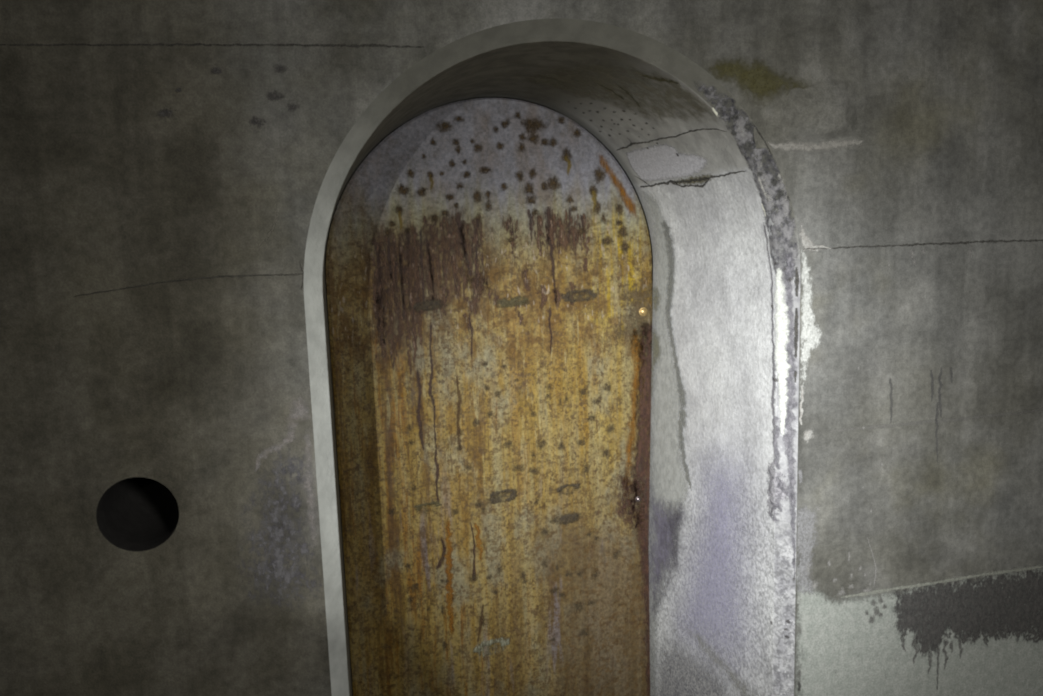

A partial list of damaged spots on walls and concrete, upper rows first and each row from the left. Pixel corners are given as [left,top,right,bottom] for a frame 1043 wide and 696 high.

corrosion [494,112,636,354]
crack [617,128,726,150]
crack [635,171,745,188]
corrosion [371,116,500,503]
corrosion [428,510,458,650]
corrosion [471,524,501,594]
corrosion [615,284,660,694]
damp [796,569,1043,696]